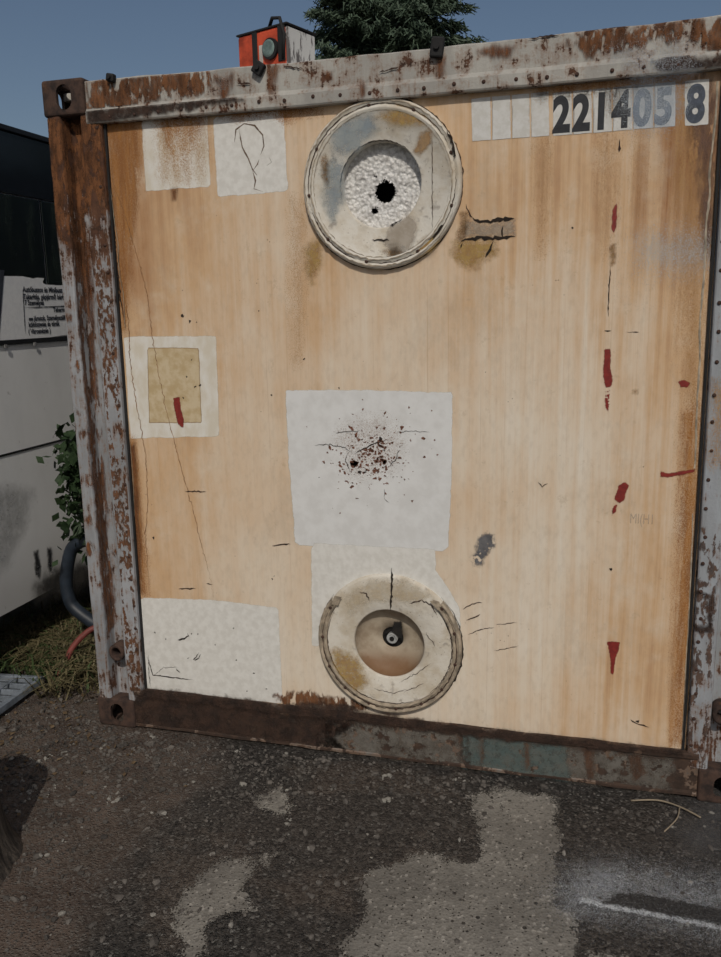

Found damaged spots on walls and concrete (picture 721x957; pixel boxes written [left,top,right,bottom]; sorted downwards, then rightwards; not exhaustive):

corrosion [47,71,325,634]
crack [360,568,436,613]
corrosion [142,17,721,784]